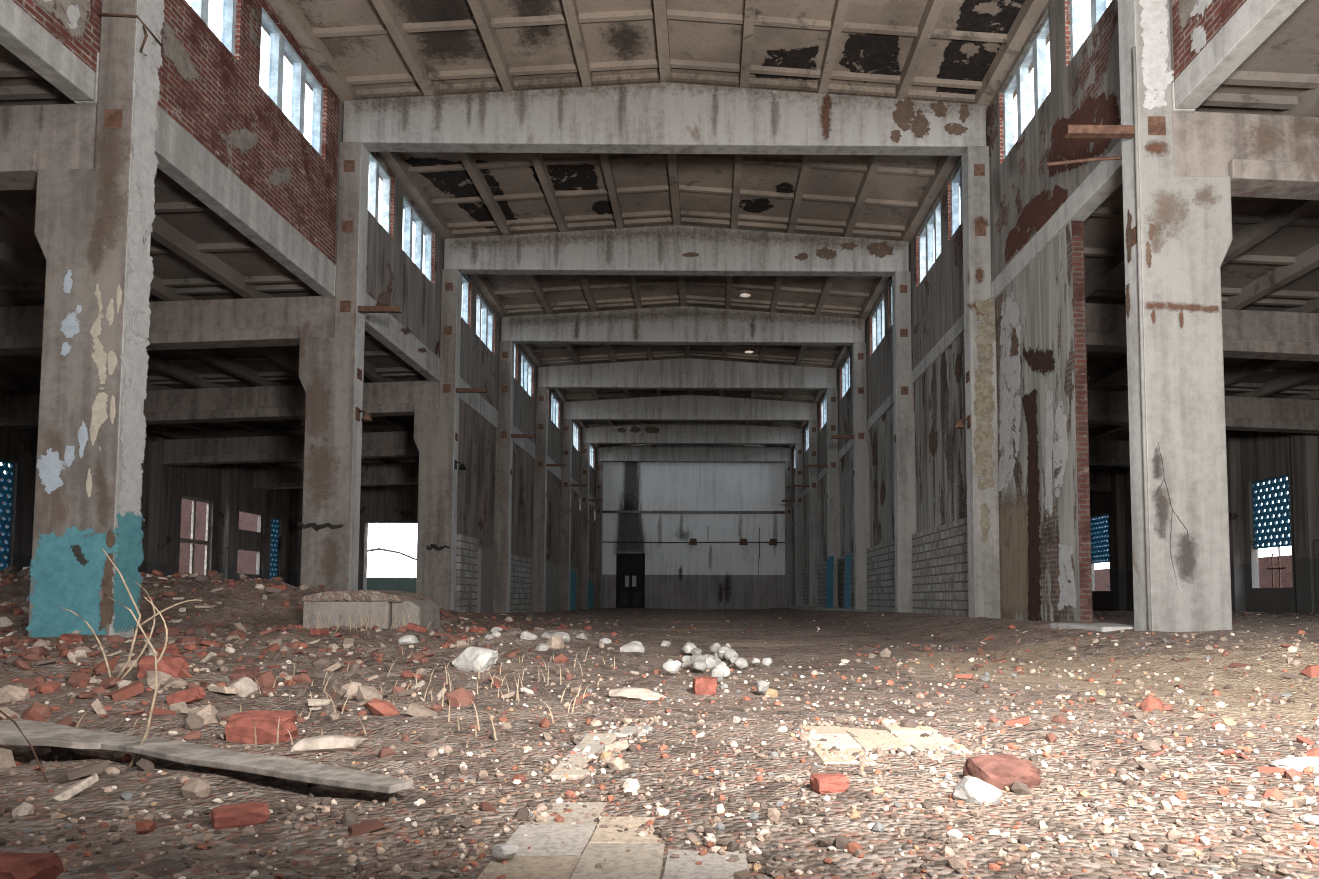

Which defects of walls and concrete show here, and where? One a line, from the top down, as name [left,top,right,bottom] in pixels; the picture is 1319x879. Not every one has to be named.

peeling [890,0,1025,143]
peeling [1138,0,1212,111]
peeling [229,127,259,153]
flaking render [1005,90,1121,264]
peeling [26,0,200,638]
peeling [928,423,938,458]
peeling [948,291,1069,621]
damp [1153,449,1168,537]
peeling [1057,543,1077,610]
damp [1177,535,1195,578]